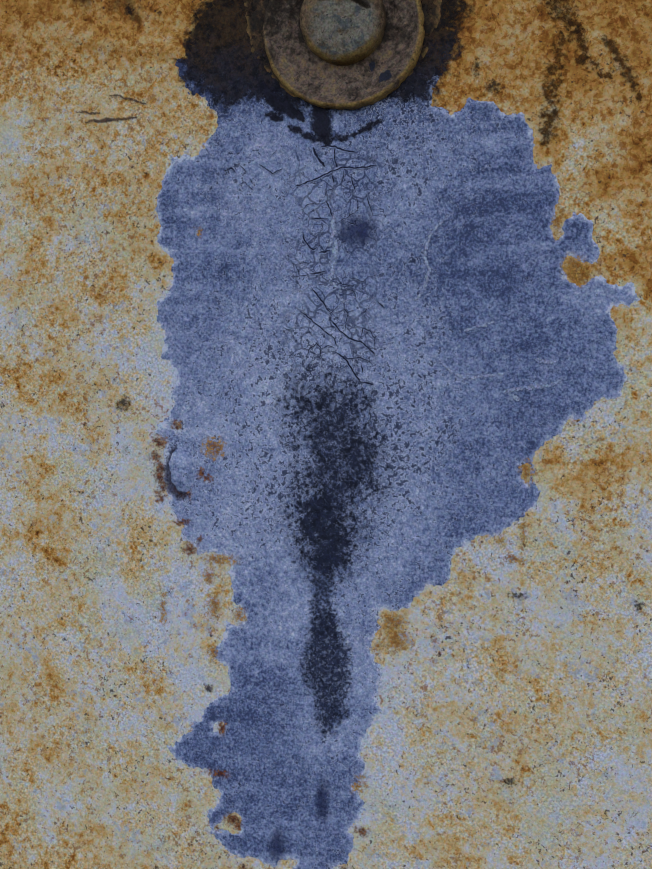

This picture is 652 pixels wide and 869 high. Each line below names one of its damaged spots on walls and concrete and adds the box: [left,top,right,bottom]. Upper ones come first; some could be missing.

corrosion [538,0,642,146]
leakage [255,81,383,148]
crack [224,150,281,191]
crack [284,145,376,386]
corrosion [150,420,182,502]
corrosion [202,437,224,461]
corrosion [183,535,236,621]
leakage [275,365,389,738]
corrosion [374,612,411,655]